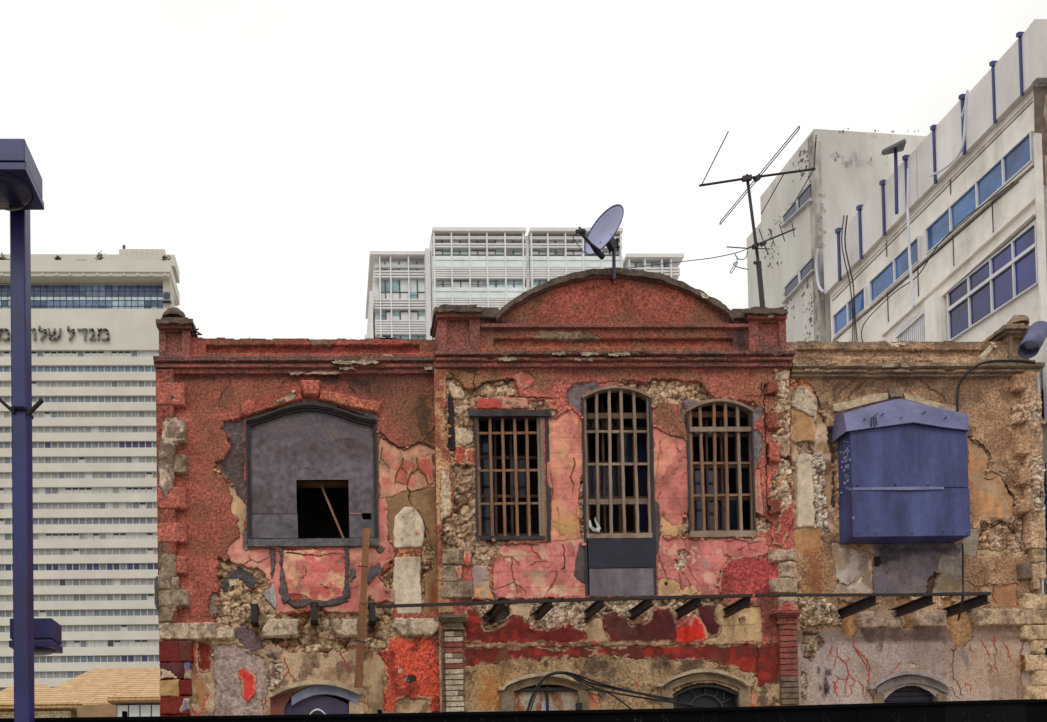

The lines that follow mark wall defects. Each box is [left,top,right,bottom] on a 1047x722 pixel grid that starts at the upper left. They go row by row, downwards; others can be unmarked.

crack [468,369,559,399]
spalling [882,363,910,372]
spalling [979,342,997,361]
peeling [157,367,882,716]
crack [483,417,580,596]
crack [968,435,1024,551]
peeling [967,438,1046,559]
peeling [926,549,979,648]
crack [826,638,901,702]
crack [951,637,1026,700]